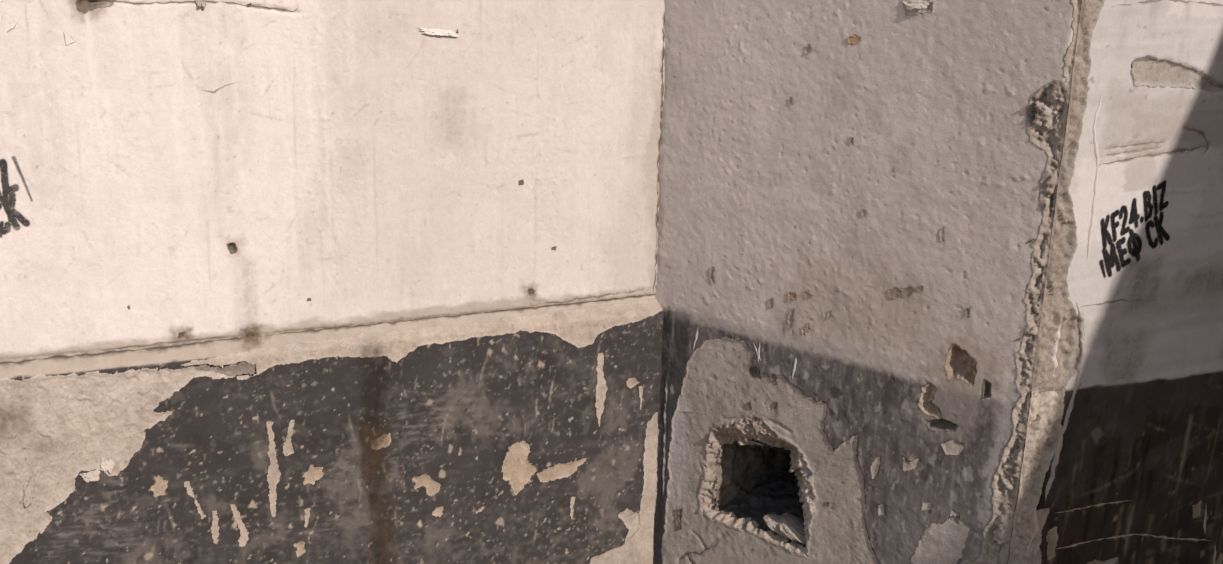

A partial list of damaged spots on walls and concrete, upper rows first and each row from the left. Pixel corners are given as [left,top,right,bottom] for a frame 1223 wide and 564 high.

crack [0,14,665,365]
spalling [911,0,1104,564]
spalling [1101,127,1209,165]
spalling [1131,55,1223,92]
peeling [0,299,663,564]
peeling [590,336,884,564]
peeling [903,457,919,471]